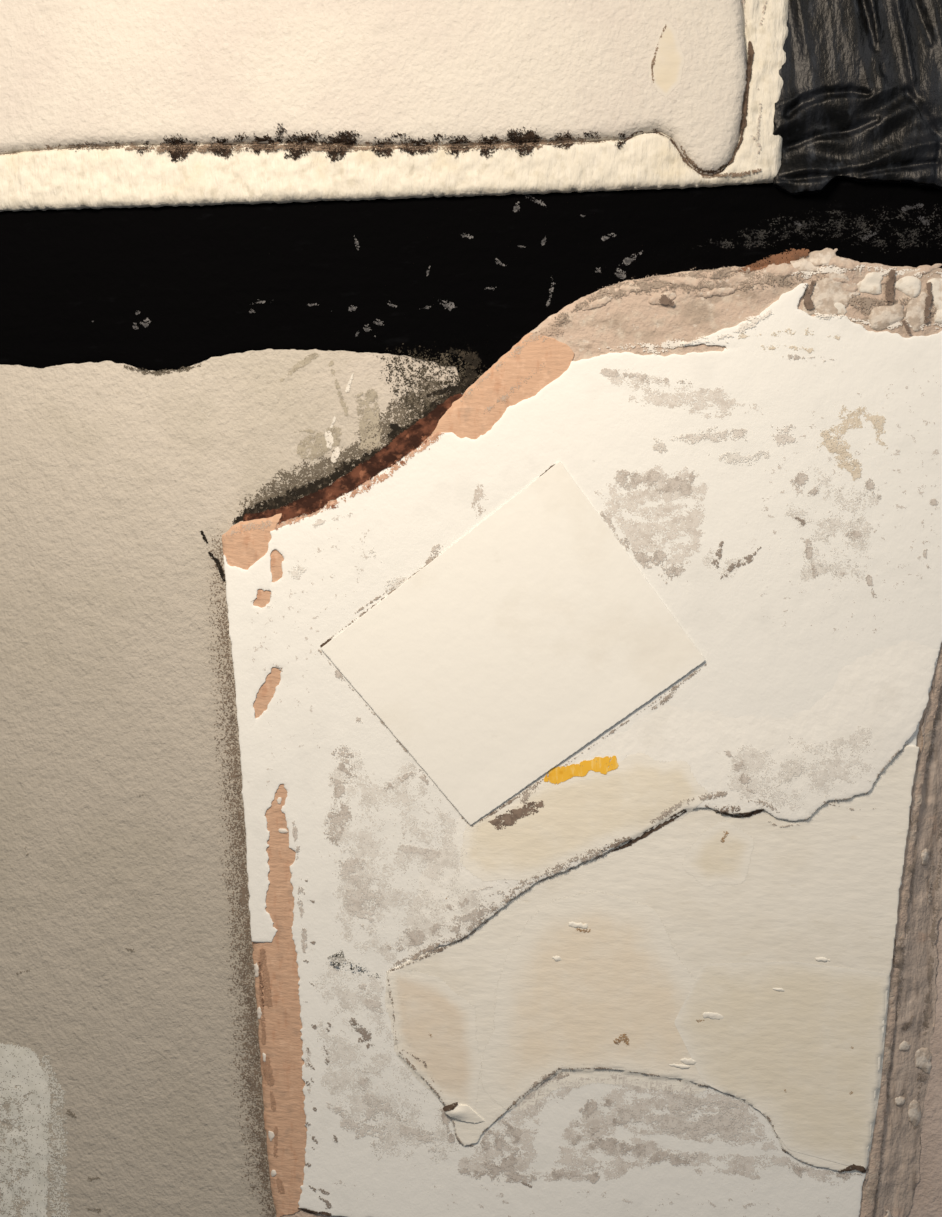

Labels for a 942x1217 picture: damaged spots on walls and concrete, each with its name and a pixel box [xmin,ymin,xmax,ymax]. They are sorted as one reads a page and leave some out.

peeling [222,513,308,608]
peeling [280,353,382,463]
peeling [471,484,489,516]
spalling [431,203,942,439]
peeling [594,368,798,584]
peeling [785,406,888,598]
damp [683,820,754,886]
peeling [252,744,854,1217]
damp [385,891,910,1214]